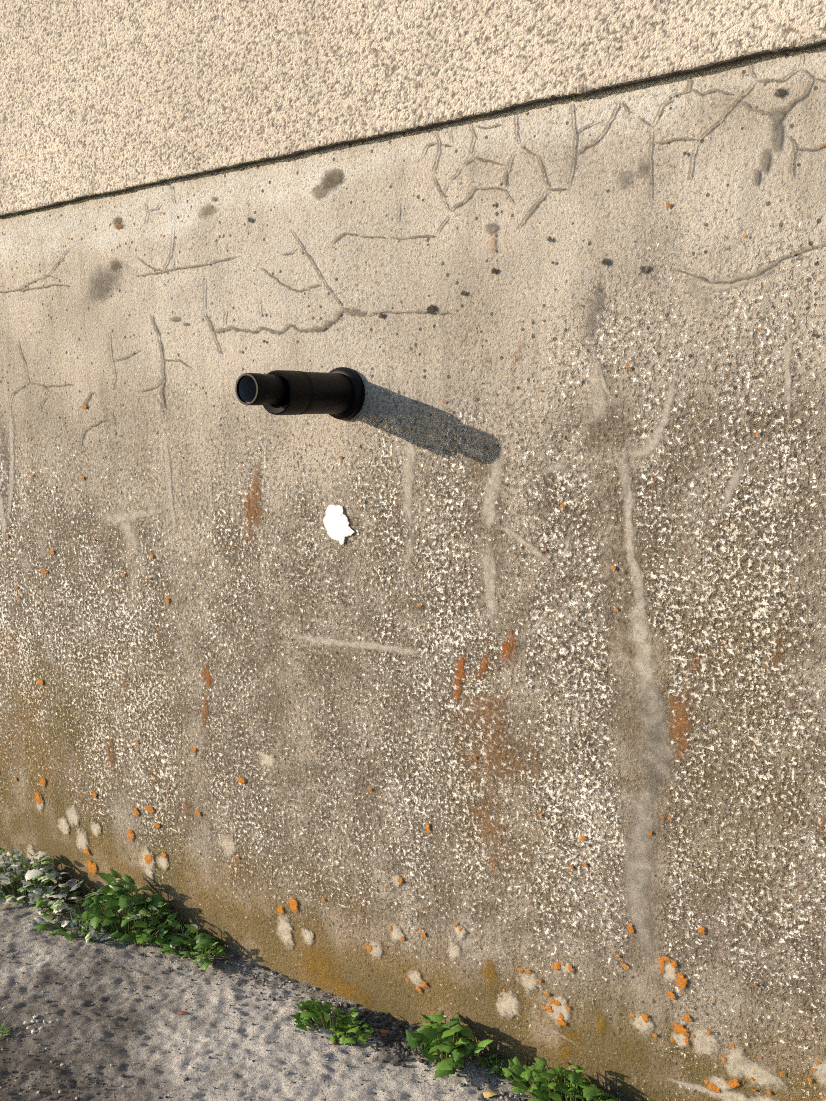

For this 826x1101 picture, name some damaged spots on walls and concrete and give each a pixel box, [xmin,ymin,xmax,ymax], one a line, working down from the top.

crack [136,53,826,353]
crack [0,250,67,293]
crack [9,315,191,446]
water stain [589,353,614,418]
corrosion [245,473,261,534]
water stain [294,634,417,655]
water stain [620,373,676,954]
efflorescence [673,1080,720,1098]